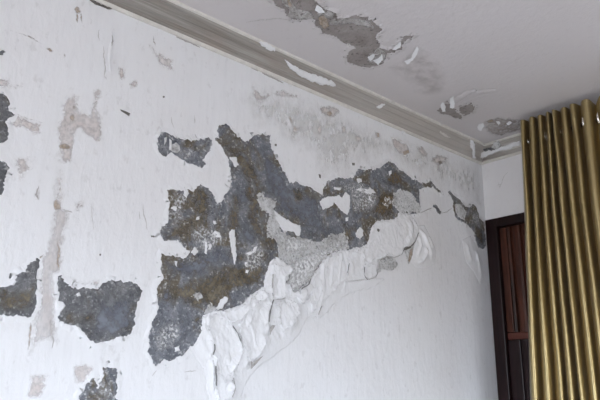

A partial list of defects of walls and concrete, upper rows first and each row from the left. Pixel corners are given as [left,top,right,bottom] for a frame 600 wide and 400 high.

flaking render [266,0,420,70]
peeling [285,60,336,87]
flaking render [434,96,479,121]
flaking render [0,87,20,201]
flaking render [0,118,487,400]